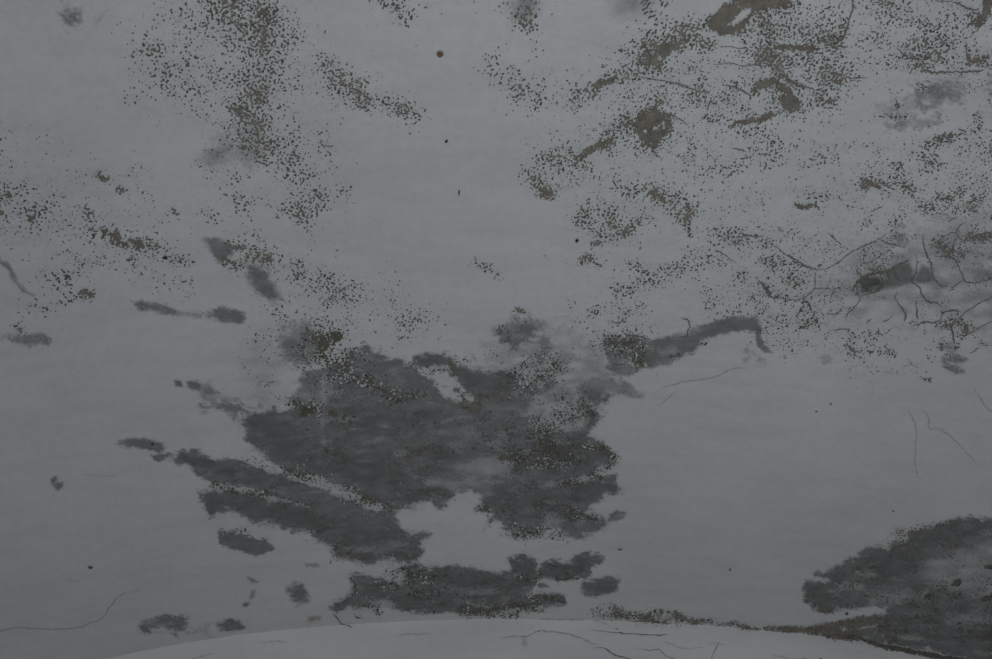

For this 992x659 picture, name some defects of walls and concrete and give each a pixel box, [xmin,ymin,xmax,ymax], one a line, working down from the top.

crack [836,0,855,44]
crack [896,0,985,74]
crack [742,217,992,353]
water stain [860,264,931,292]
water stain [136,301,176,314]
water stain [122,303,769,625]
water stain [801,515,992,659]
water stain [141,615,187,632]
water stain [219,619,245,631]
crack [572,620,667,659]